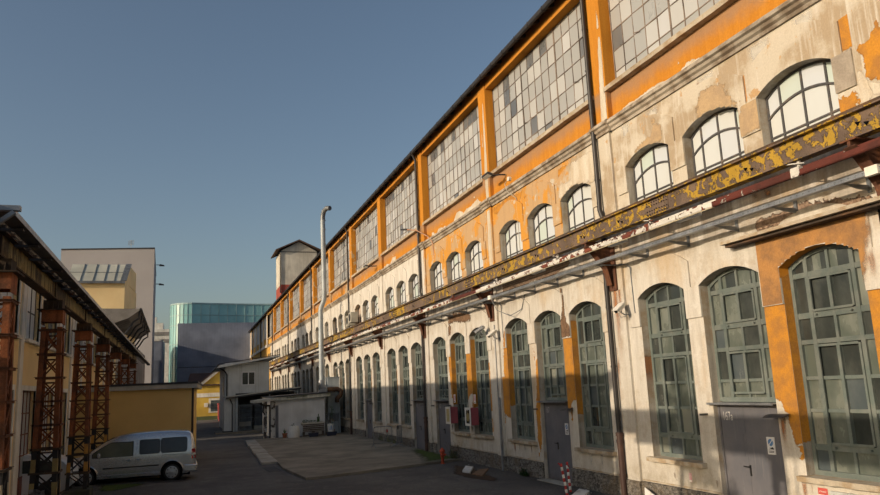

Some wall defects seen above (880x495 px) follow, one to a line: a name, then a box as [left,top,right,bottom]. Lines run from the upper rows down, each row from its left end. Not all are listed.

peeling [838,14,880,113]
peeling [764,244,842,460]
peeling [868,289,880,369]